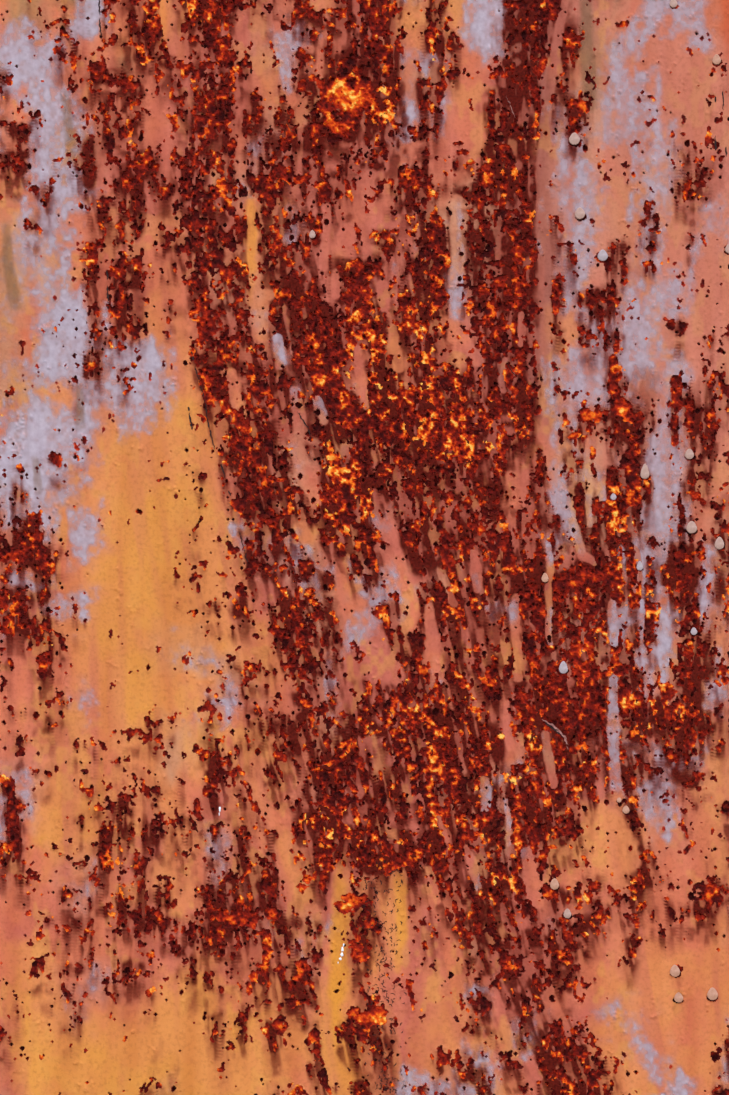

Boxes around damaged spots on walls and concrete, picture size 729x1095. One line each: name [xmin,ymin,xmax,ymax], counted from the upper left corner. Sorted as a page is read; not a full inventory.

rust [596,148,645,191]
rust [637,85,729,269]
rust [161,299,177,339]
rust [35,436,93,486]
rust [183,462,208,544]
rust [173,550,212,593]
rust [73,737,108,753]
rust [110,704,189,768]
rust [711,797,729,839]
rust [383,963,426,1022]
rust [404,1083,447,1095]